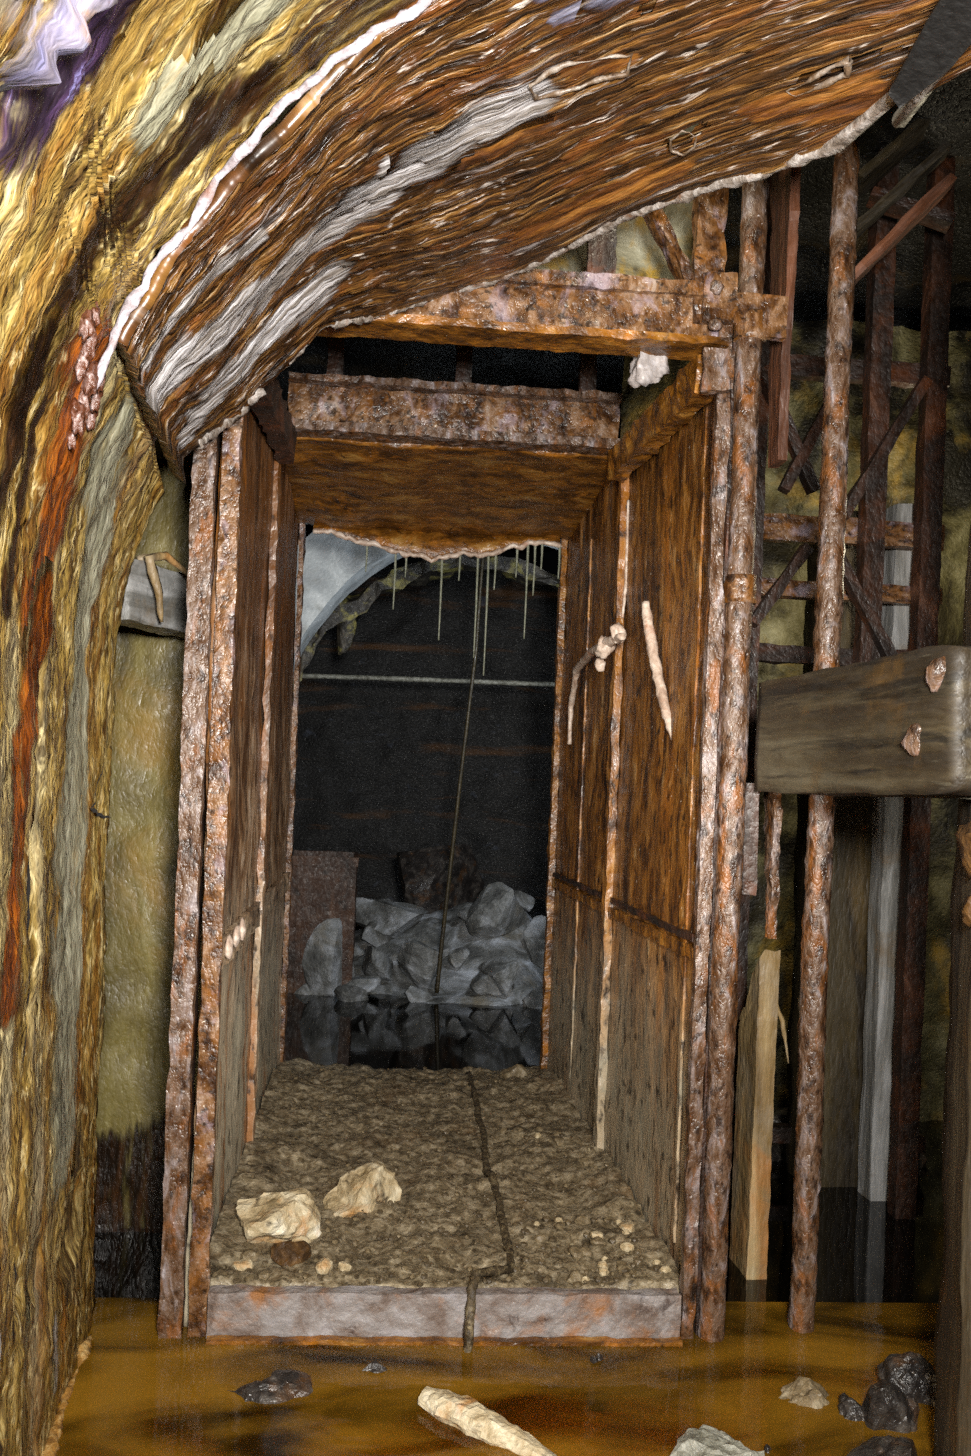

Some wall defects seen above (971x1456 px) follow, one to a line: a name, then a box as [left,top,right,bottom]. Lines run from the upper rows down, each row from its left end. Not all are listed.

leakage [0,0,415,387]
leakage [40,81,560,1200]
rust [0,0,971,1028]